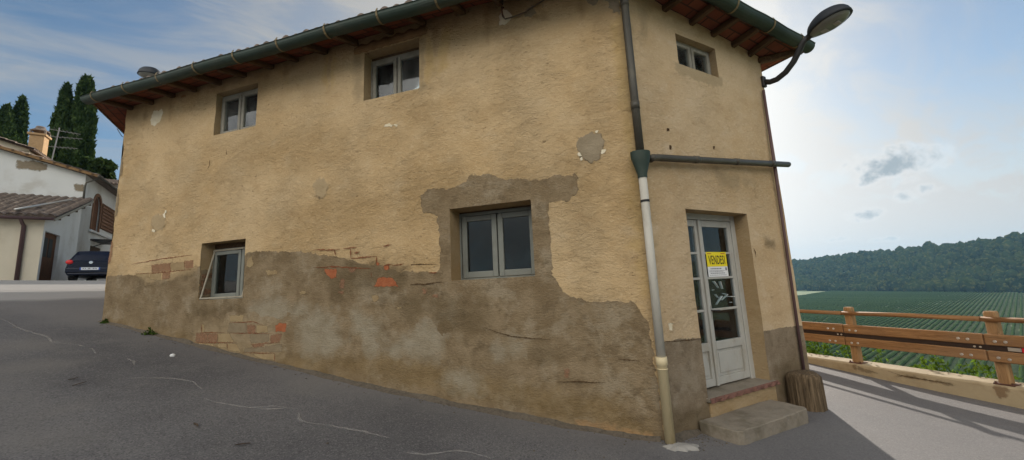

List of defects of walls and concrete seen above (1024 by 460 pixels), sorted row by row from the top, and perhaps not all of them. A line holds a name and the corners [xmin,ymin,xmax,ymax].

spalling [149,108,165,129]
peeling [102,152,708,441]